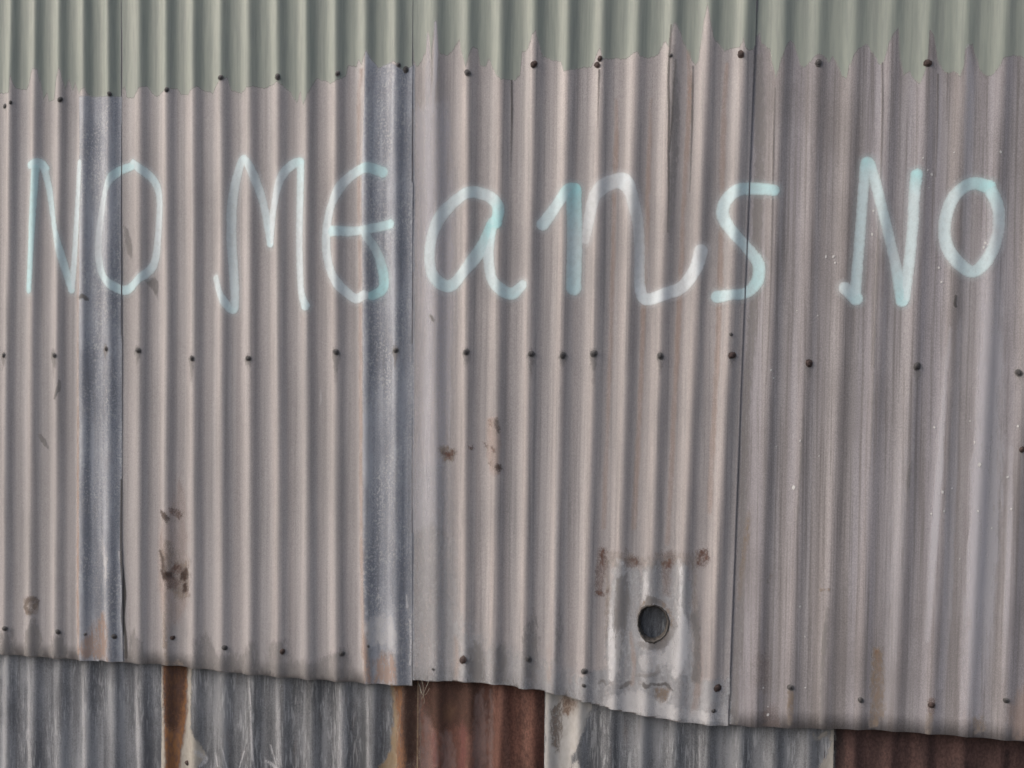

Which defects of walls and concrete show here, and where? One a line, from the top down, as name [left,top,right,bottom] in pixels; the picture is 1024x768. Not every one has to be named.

corrosion [440,446,455,461]
corrosion [159,542,188,598]
corrosion [161,627,205,768]
corrosion [364,653,481,768]